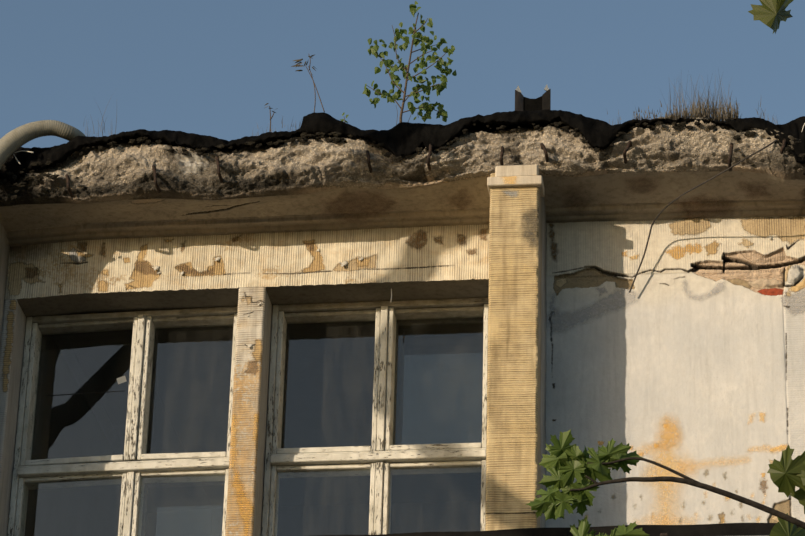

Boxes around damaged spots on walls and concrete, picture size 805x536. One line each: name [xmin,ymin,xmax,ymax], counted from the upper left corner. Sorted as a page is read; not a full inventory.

spalling [25,144,209,193]
spalling [225,137,393,188]
spalling [422,120,780,182]
crack [188,202,253,214]
peeling [123,245,161,290]
peeling [175,256,225,276]
peeling [302,240,377,273]
peeling [406,230,443,250]
peeling [458,234,476,255]
flaking render [554,268,635,296]
crack [555,240,805,308]
flaking render [667,216,805,296]